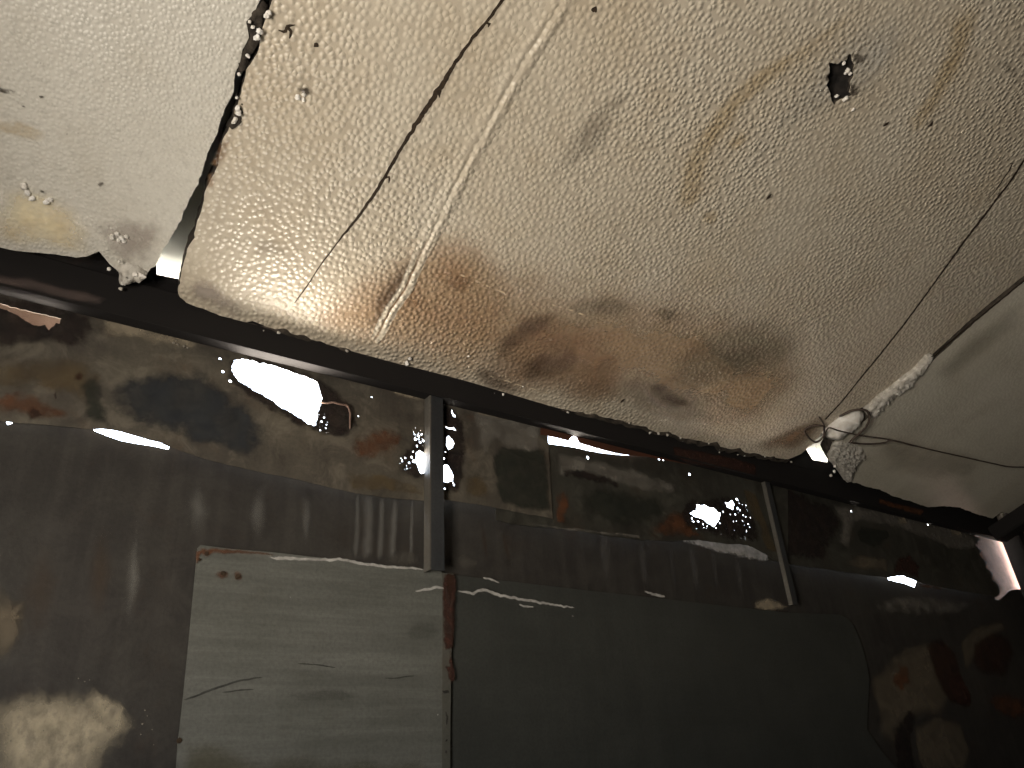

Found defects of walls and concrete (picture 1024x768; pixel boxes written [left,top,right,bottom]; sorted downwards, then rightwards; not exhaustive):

hole [826,54,863,112]
crack [295,0,504,302]
spalling [107,260,148,291]
crack [824,160,1024,420]
water stain [500,320,779,412]
water stain [118,375,259,453]
spalling [824,441,866,483]
corrosion [443,574,456,693]